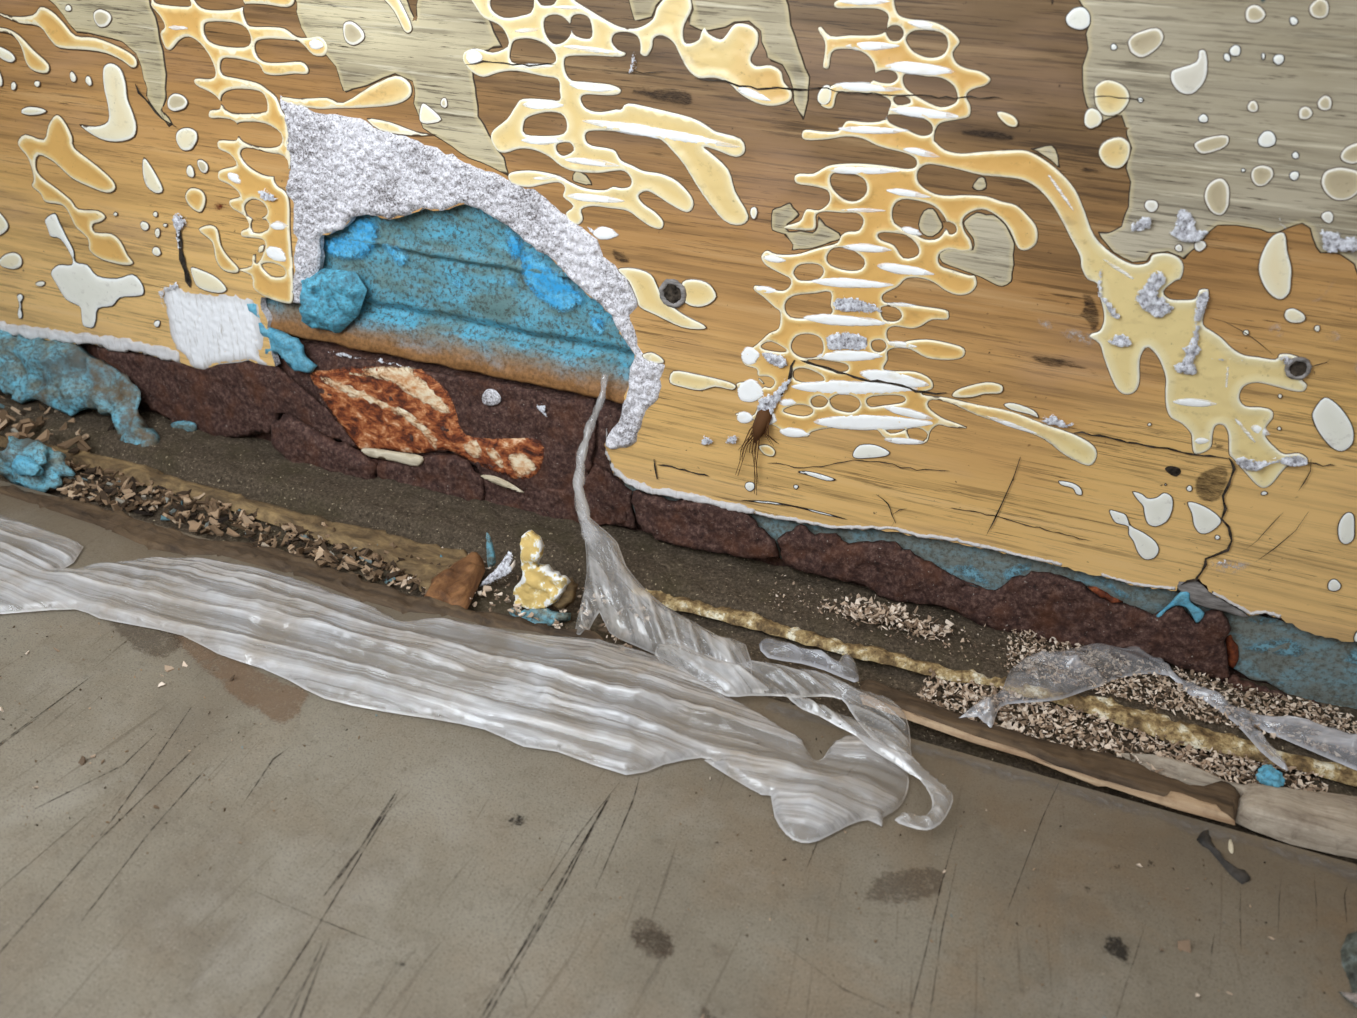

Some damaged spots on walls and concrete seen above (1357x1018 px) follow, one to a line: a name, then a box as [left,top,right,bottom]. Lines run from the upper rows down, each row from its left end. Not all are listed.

peeling [49,0,173,127]
peeling [688,0,810,120]
peeling [1078,0,1357,273]
spalling [280,0,665,449]
peeling [771,202,841,250]
peeling [939,212,1015,287]
peeling [0,330,160,447]
spalling [164,283,317,373]
spalling [480,530,578,627]
rust [96,345,1287,699]
peeling [749,514,1357,709]
crack [1075,431,1336,585]